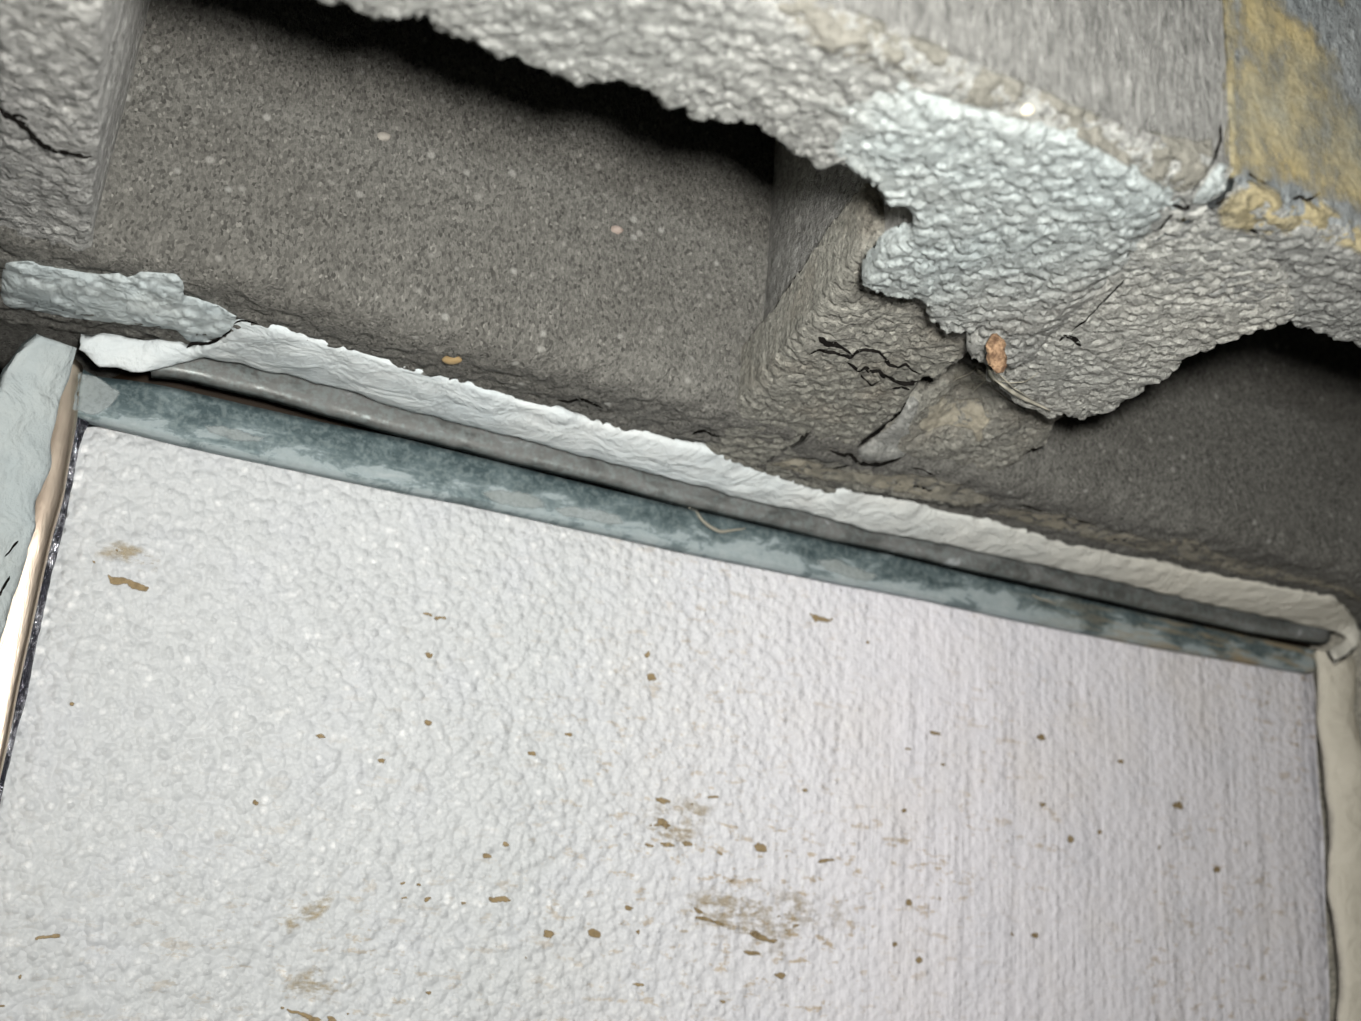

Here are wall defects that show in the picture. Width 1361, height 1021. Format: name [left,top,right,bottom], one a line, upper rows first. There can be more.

damp [1222,0,1361,204]
crack [809,337,935,492]